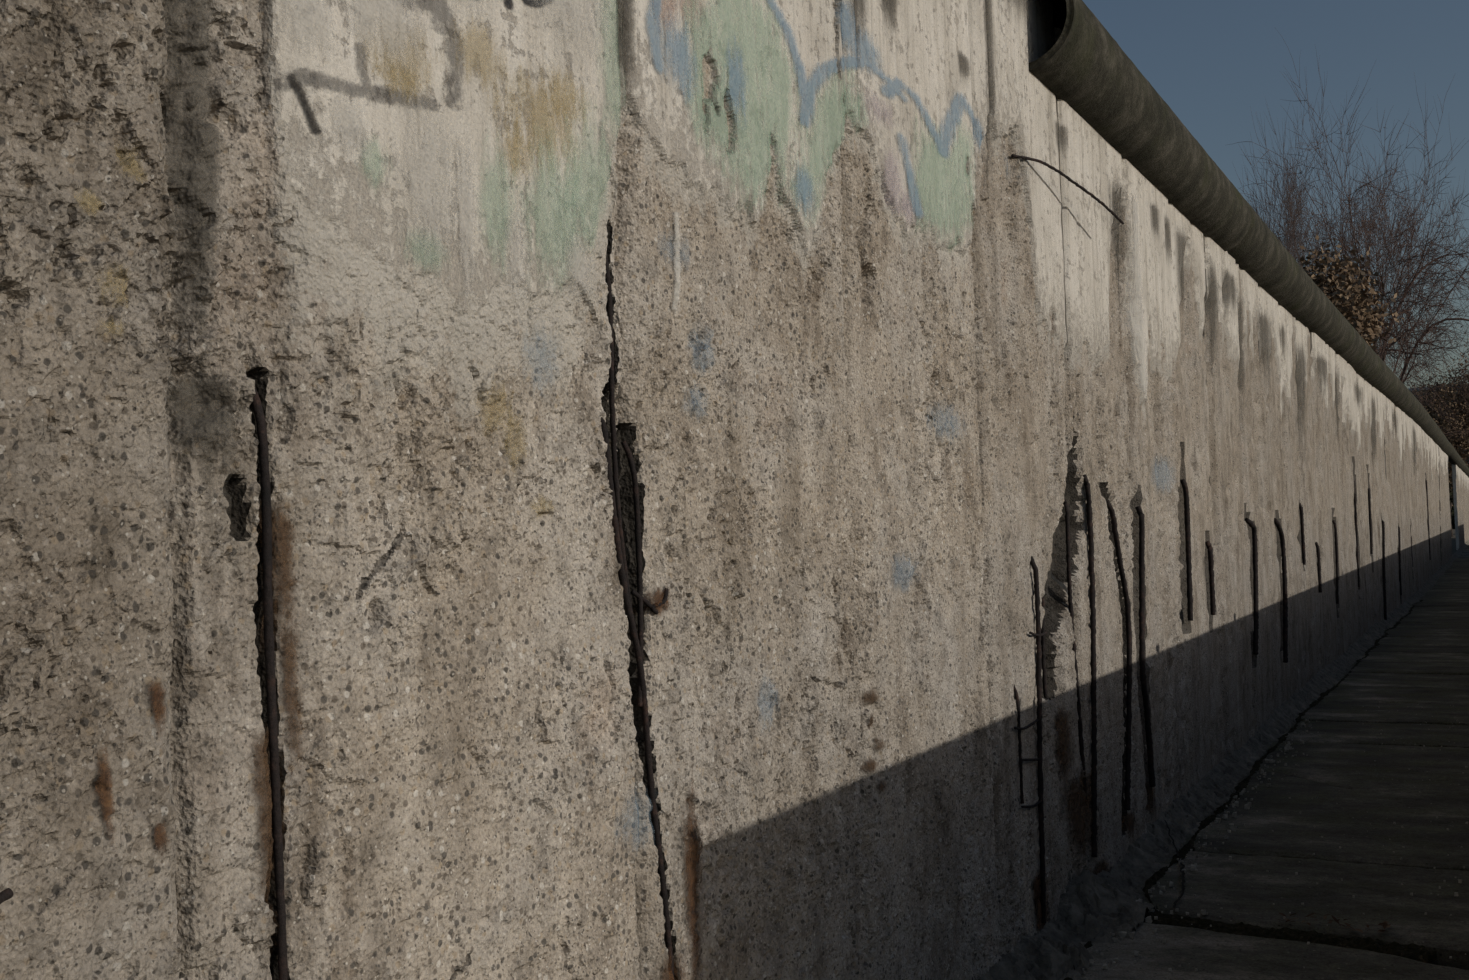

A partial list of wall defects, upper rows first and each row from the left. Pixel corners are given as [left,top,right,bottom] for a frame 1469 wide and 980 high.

spalling [700,52,736,153]
spalling [833,0,841,80]
spalling [0,0,669,980]
spalling [609,98,1453,980]
spalling [1456,472,1469,548]
corrosion [257,508,302,751]
corrosion [255,733,285,896]
corrosion [664,789,706,980]
corrosion [1056,708,1093,848]